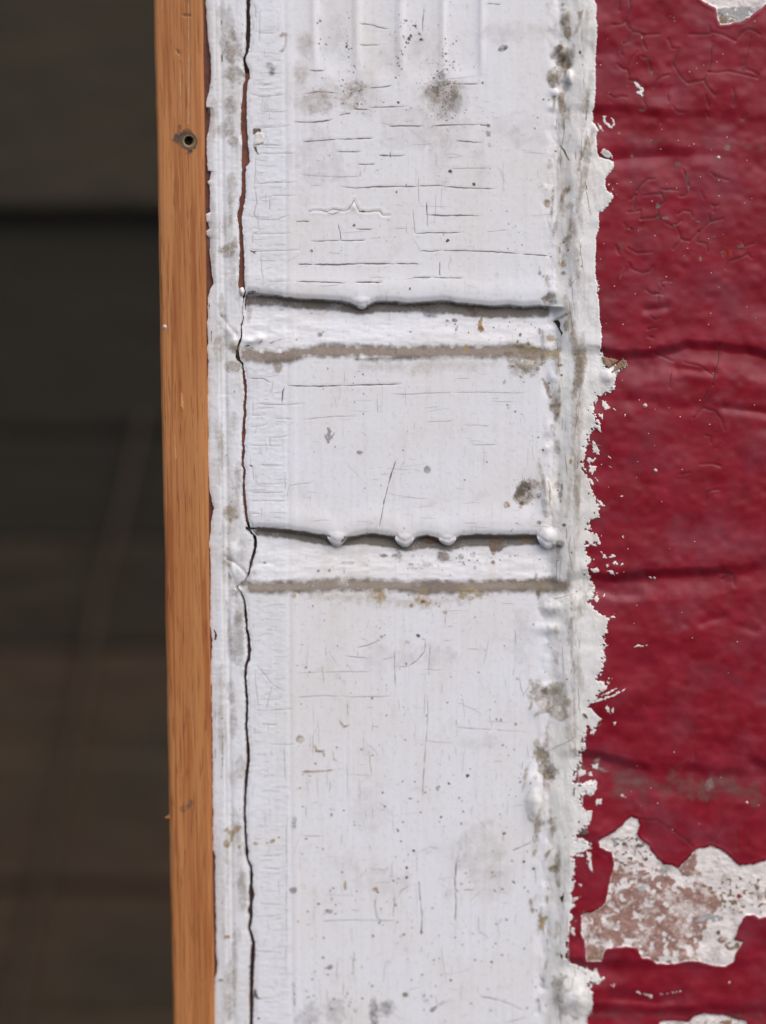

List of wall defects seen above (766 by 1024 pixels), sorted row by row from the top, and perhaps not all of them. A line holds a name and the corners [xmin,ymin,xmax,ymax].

crack [610,0,761,118]
peeling [702,0,766,24]
crack [237,0,548,1024]
peeling [587,455,612,485]
peeling [574,764,602,835]
peeling [570,817,766,966]